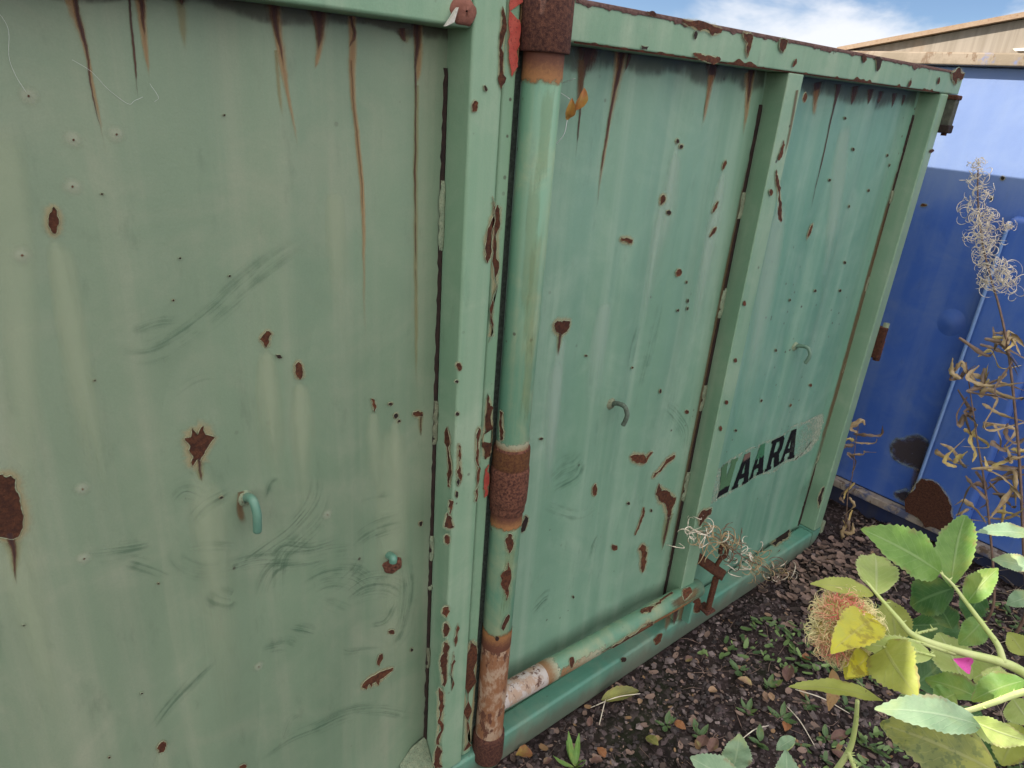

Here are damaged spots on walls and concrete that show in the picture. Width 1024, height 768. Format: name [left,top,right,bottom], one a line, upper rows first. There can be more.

corrosion [66,0,99,121]
corrosion [574,0,965,198]
corrosion [484,196,501,342]
corrosion [630,199,741,546]
corrosion [820,199,890,450]
corrosion [0,471,28,578]
corrosion [183,425,216,479]
corrosion [474,395,530,502]
corrosion [890,436,953,530]
corrosion [607,587,701,649]
corrosion [433,606,450,768]
corrosion [463,626,512,751]